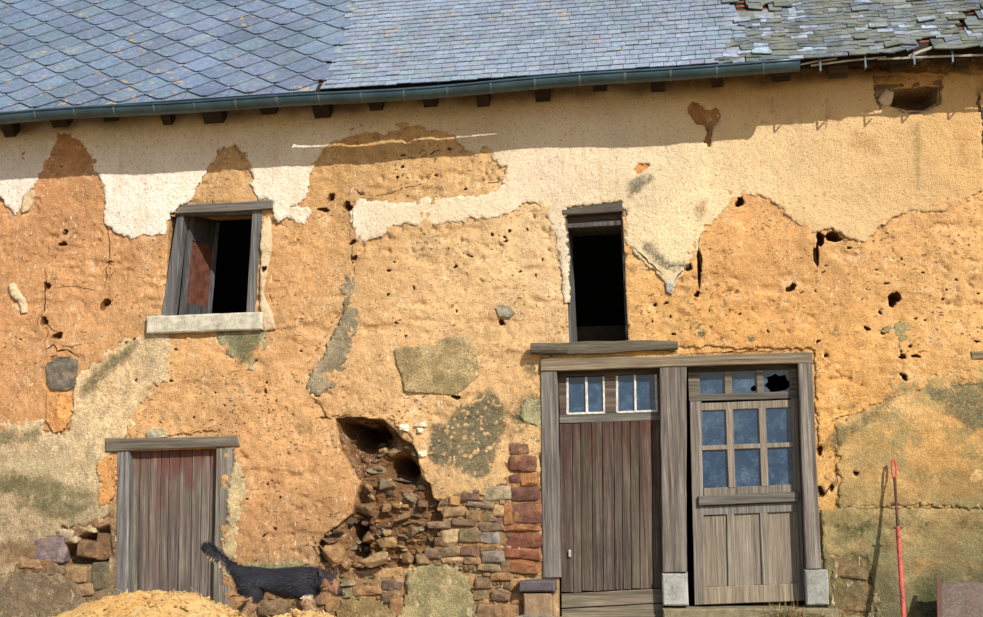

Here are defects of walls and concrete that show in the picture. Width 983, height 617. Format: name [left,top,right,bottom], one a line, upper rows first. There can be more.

spalling [687,101,721,147]
spalling [873,79,943,115]
spalling [0,133,169,431]
spalling [622,189,983,456]
spalling [126,122,569,617]
water stain [429,391,538,478]
water stain [928,381,983,429]
water stain [0,456,91,517]
crack [823,437,983,510]
water stain [916,577,937,617]